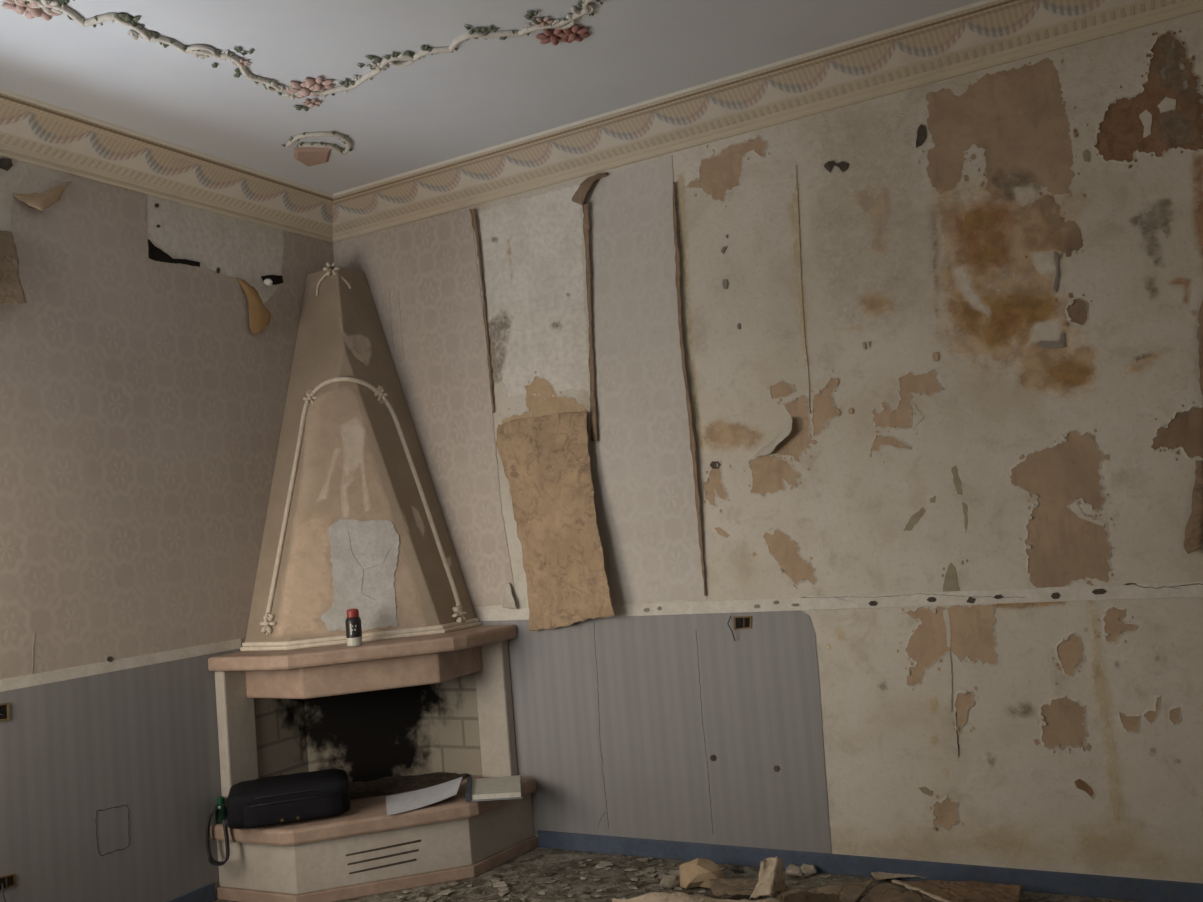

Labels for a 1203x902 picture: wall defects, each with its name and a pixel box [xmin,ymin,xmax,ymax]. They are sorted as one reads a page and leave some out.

flaking render [146,194,283,303]
peeling [684,135,770,207]
leakage [934,173,1093,393]
peeling [916,29,1203,348]
peeling [702,370,842,538]
peeling [753,528,818,589]
peeling [897,559,999,690]
peeling [1009,428,1115,588]